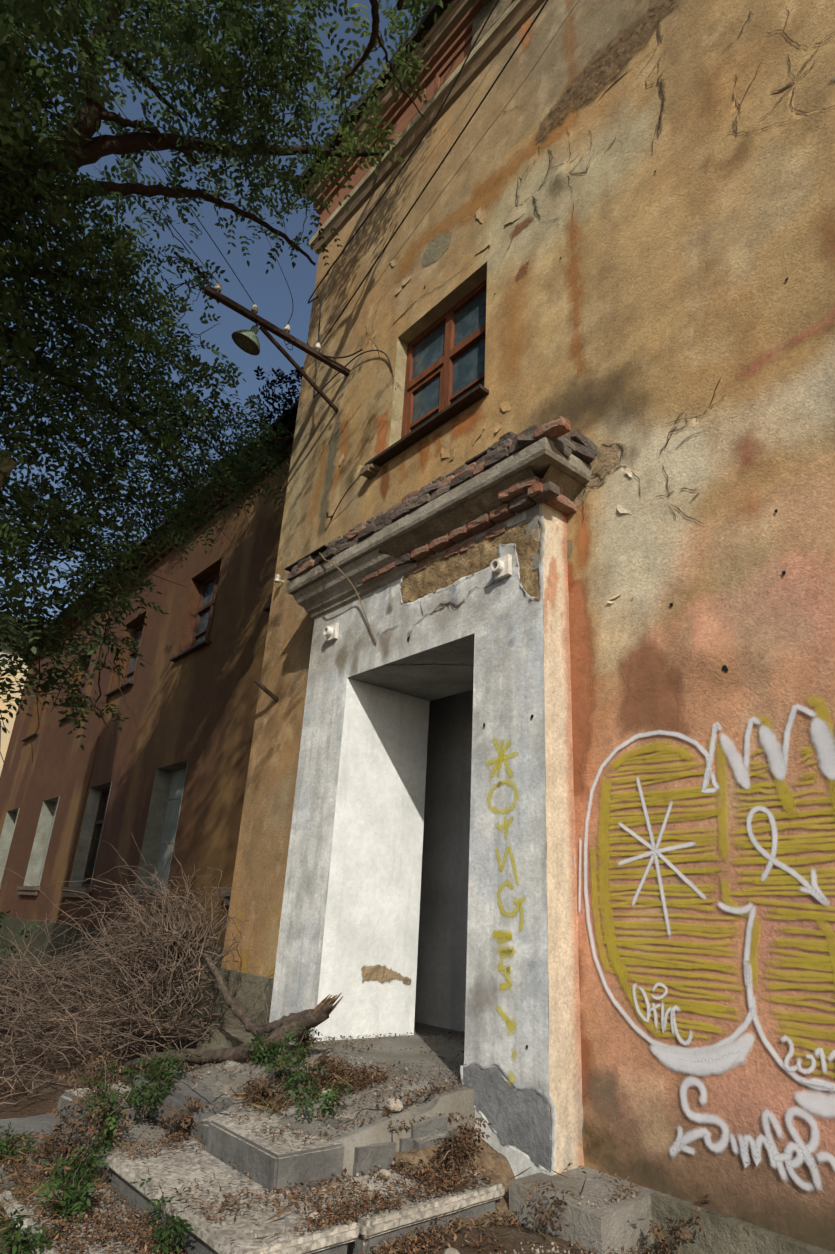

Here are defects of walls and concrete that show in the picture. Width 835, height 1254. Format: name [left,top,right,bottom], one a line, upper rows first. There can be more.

spalling [536,0,676,144]
crack [598,23,667,156]
crack [722,9,835,136]
crack [515,94,616,222]
crack [582,378,726,524]
spalling [399,515,545,606]
water stain [620,644,681,732]
spalling [361,965,411,985]
spalling [460,1060,557,1176]